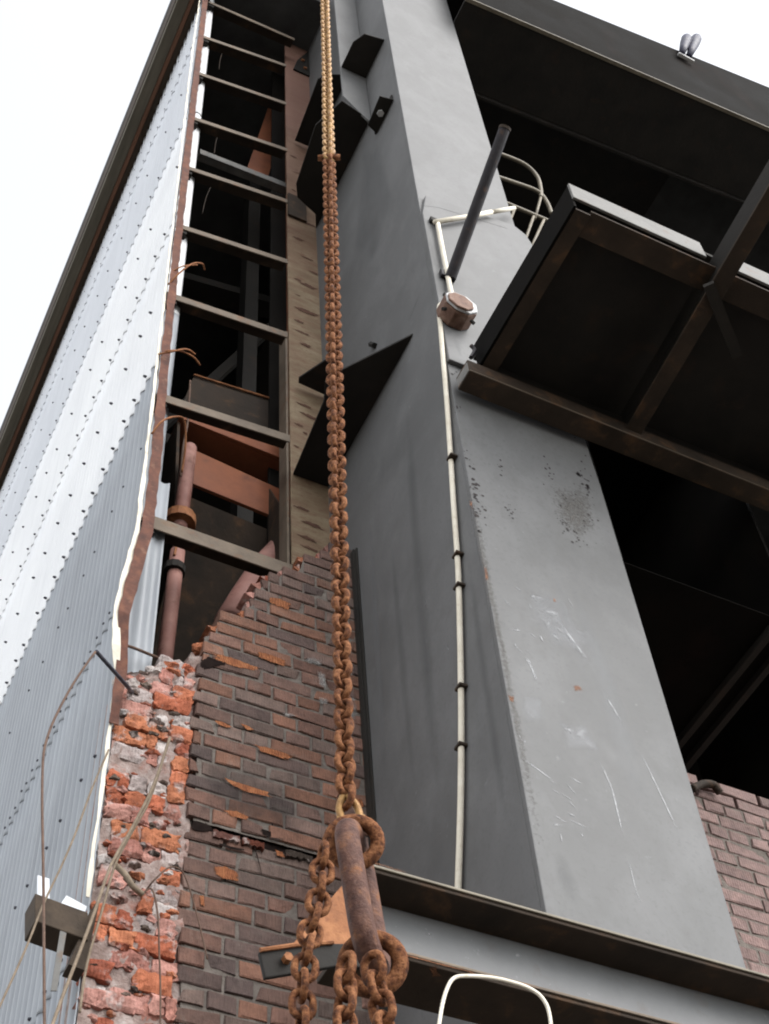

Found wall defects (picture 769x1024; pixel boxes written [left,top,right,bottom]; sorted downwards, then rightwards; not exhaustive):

rust [464,450,487,533]
spalling [236,505,328,618]
spalling [58,625,285,1024]
crack [192,821,317,876]